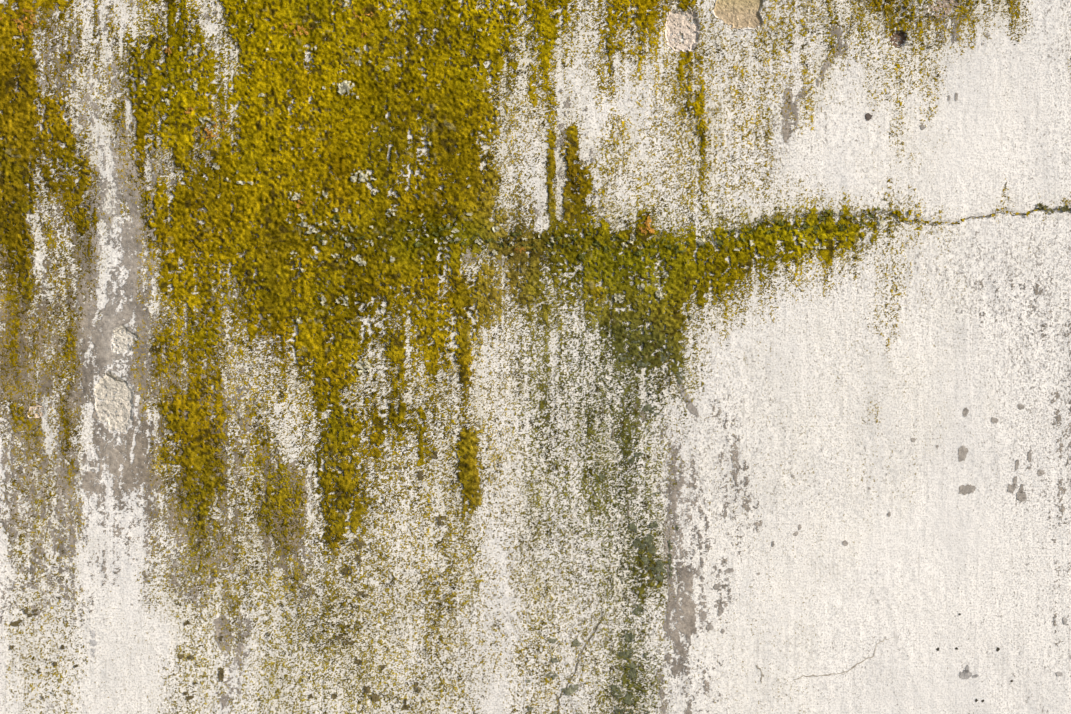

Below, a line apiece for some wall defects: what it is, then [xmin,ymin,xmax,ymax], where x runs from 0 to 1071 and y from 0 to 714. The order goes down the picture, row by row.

spalling [665,9,700,52]
spalling [711,0,765,30]
water stain [579,0,948,252]
crack [799,208,1071,223]
water stain [135,178,950,714]
water stain [0,411,97,714]
crack [791,637,893,682]